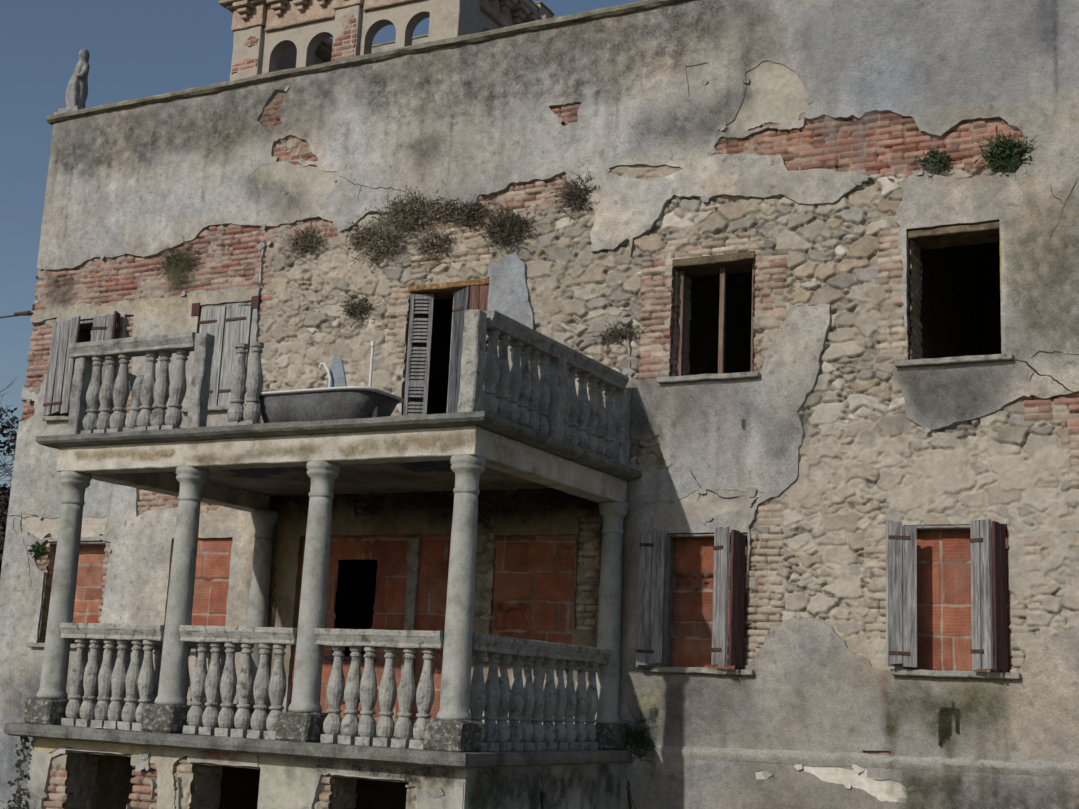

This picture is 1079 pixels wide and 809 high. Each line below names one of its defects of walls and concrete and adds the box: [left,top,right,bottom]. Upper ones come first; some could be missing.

flaking render [21,61,1079,673]
crack [1014,351,1079,392]
flaking render [33,737,204,809]
flaking render [252,755,334,809]
water stain [470,764,620,809]
crack [627,771,635,809]
flaking render [794,764,916,803]
water stain [903,773,1079,809]